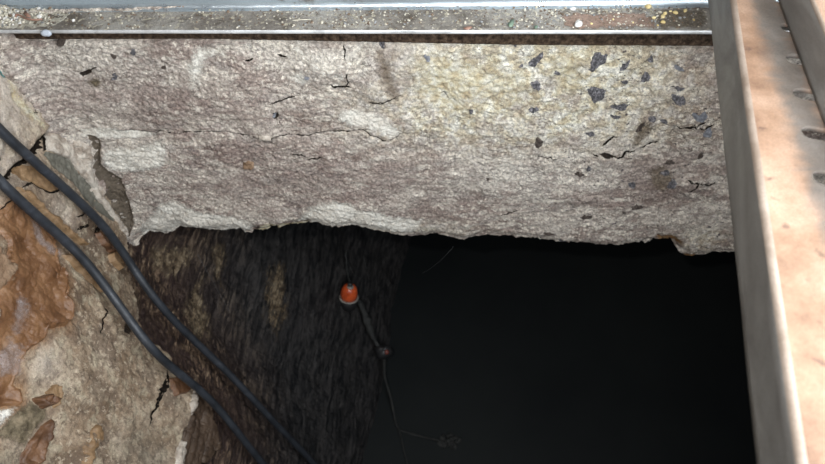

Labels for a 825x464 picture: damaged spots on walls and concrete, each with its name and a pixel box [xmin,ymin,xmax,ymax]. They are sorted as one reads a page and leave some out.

crack [330,46,351,88]
spalling [519,52,544,68]
spalling [588,52,608,72]
spalling [587,87,606,104]
spalling [671,86,686,107]
spalling [610,103,628,119]
spalling [636,116,668,133]
crack [123,129,403,160]
spalling [16,132,143,271]
peeling [32,384,64,409]
crack [150,370,169,424]
peeling [169,377,221,464]